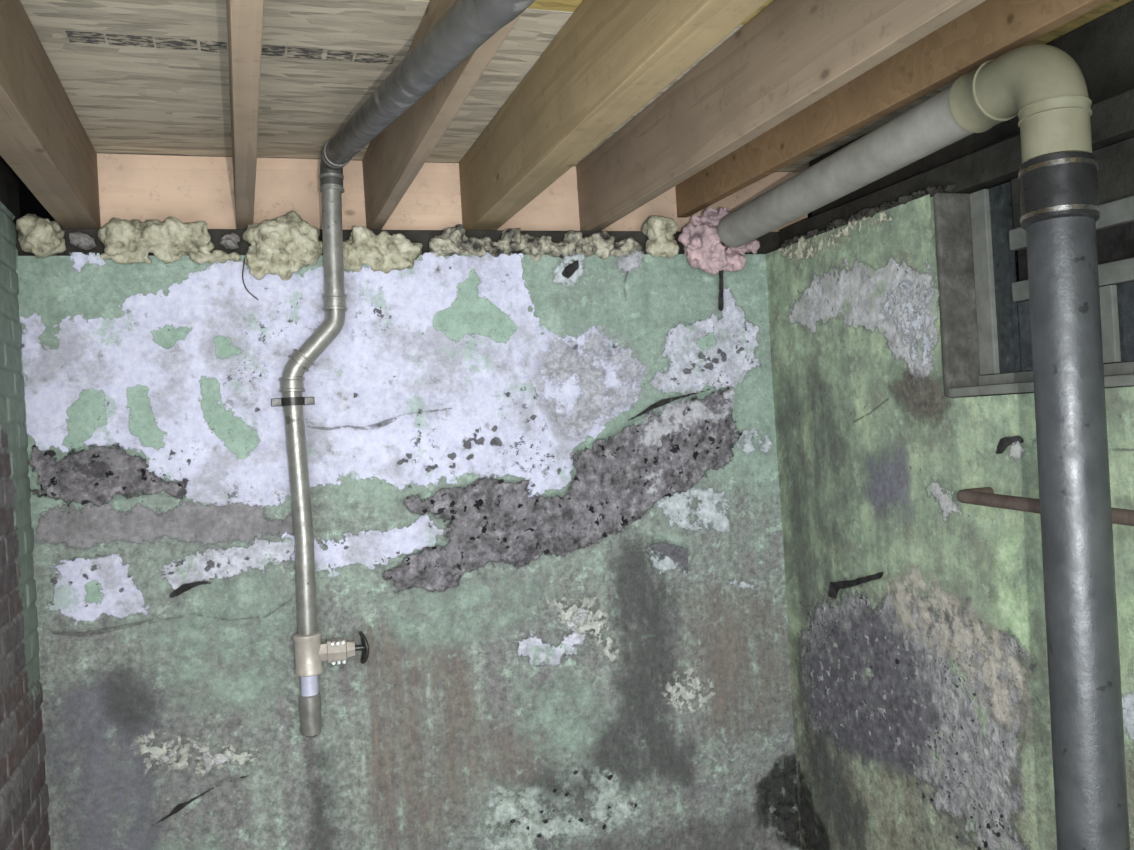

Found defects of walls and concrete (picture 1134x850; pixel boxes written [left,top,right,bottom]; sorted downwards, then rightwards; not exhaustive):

peeling [68,252,107,272]
peeling [20,260,326,625]
peeling [302,252,772,596]
crack [630,382,728,420]
peeling [789,256,940,380]
crack [152,776,248,826]
leakage [478,543,716,850]
leakage [756,641,866,850]
spalling [799,567,1036,850]
peeling [1122,692,1134,740]